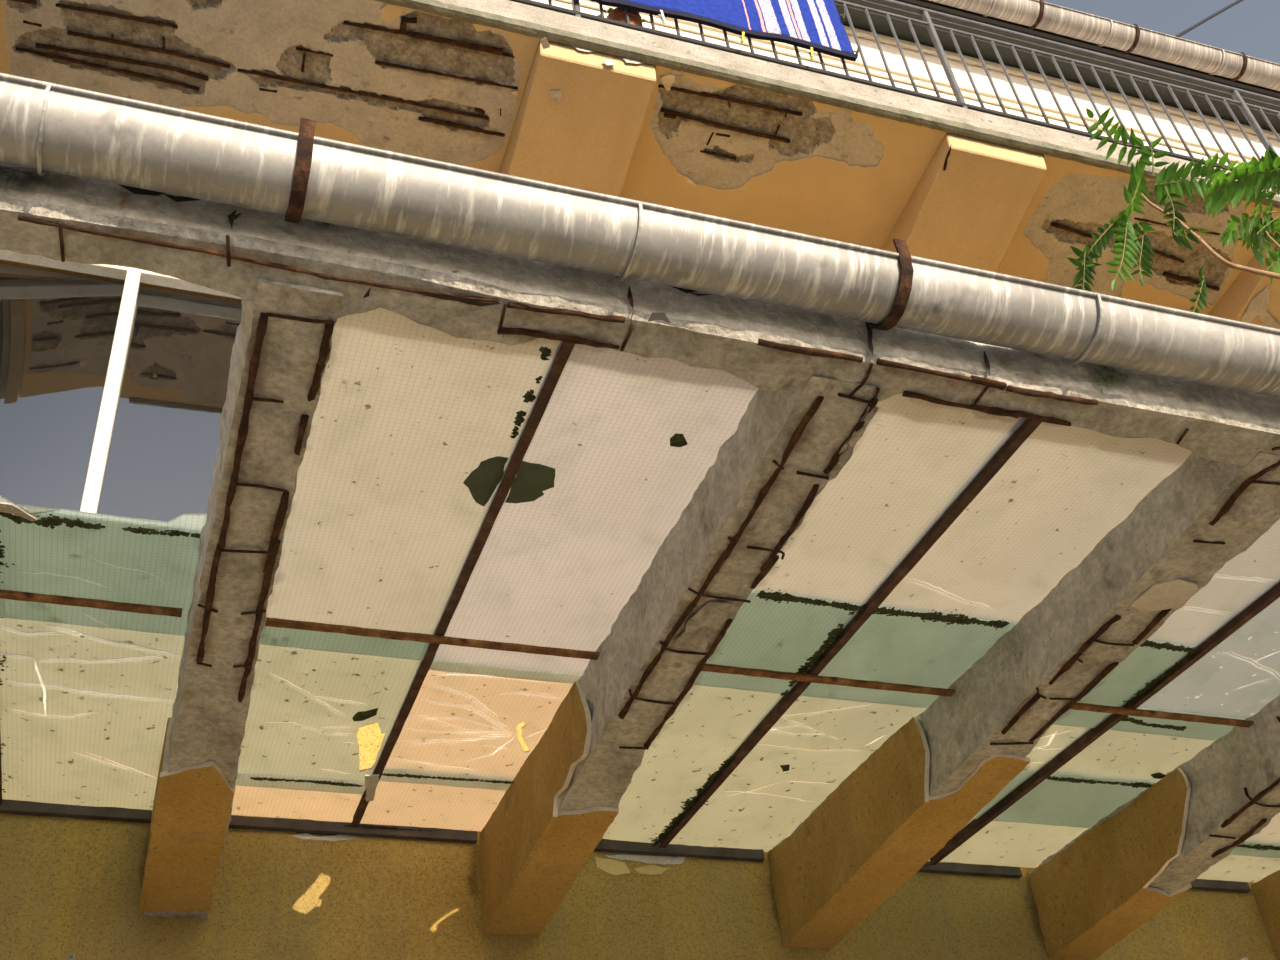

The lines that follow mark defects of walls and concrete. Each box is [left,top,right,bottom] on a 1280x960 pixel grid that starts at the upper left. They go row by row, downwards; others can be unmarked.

spalling [4,0,523,165]
peeling [573,46,644,66]
spalling [649,69,884,189]
spalling [1022,172,1244,305]
spalling [828,406,879,481]
rust [618,338,1099,750]
rust [1193,446,1280,545]
spalling [674,601,732,652]
rust [990,609,1171,745]